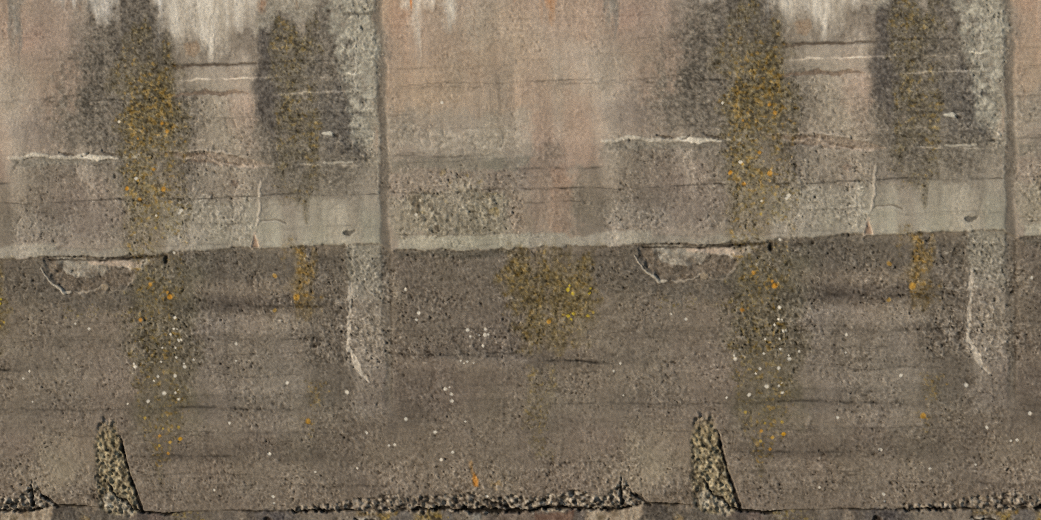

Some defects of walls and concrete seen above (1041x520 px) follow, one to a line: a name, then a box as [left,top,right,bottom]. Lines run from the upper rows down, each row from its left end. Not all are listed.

damp [397,0,461,70]
damp [32,0,384,226]
damp [629,0,738,194]
damp [759,0,926,205]
damp [912,0,1011,212]
crack [0,504,96,514]
spalling [93,419,144,518]
crack [130,502,690,516]
spalling [689,414,743,517]
crack [727,504,1041,515]